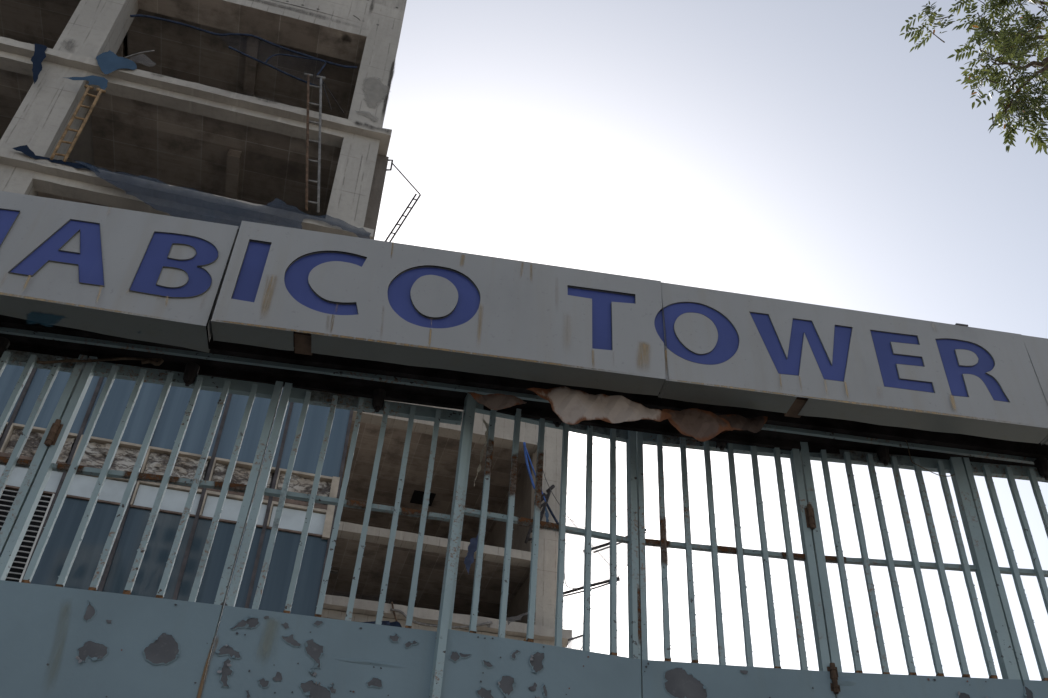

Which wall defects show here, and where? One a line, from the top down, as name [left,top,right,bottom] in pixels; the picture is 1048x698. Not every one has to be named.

leakage [383,62,395,113]
peeling [230,615,269,635]
peeling [143,632,180,665]
peeling [207,643,242,688]
peeling [281,620,336,698]
peeling [449,646,548,698]
peeling [663,667,708,698]